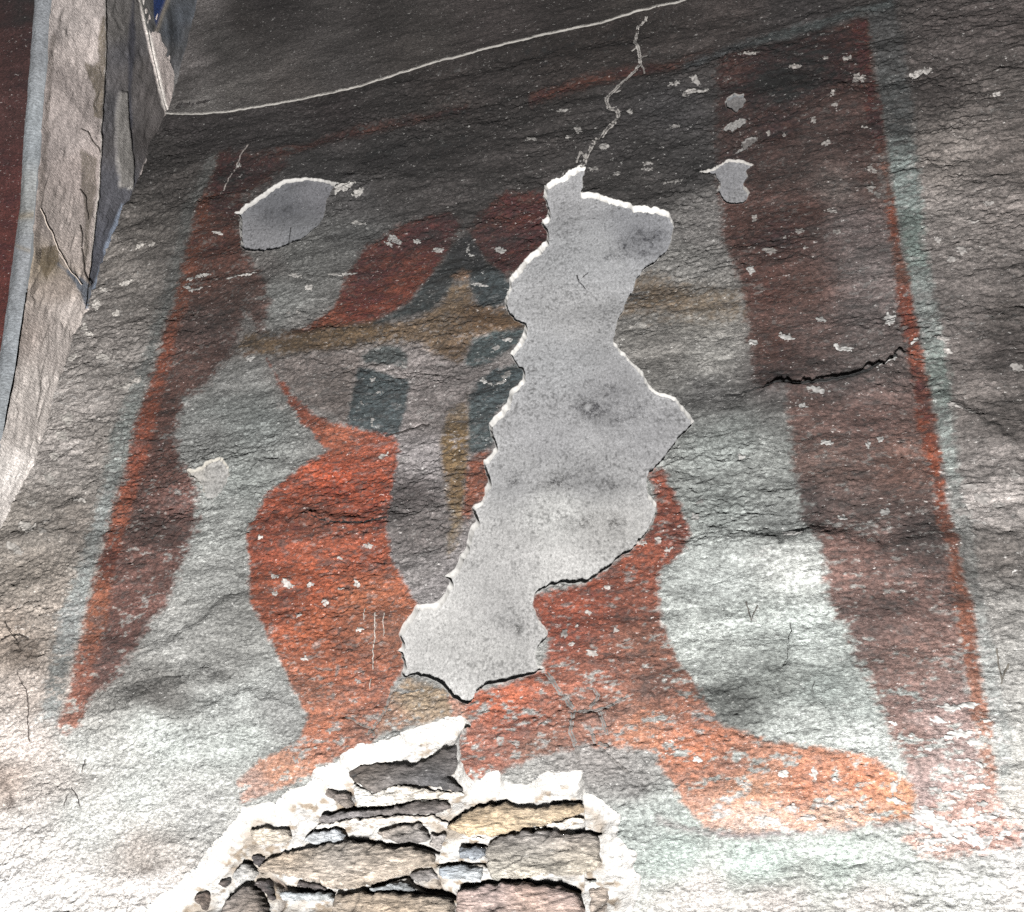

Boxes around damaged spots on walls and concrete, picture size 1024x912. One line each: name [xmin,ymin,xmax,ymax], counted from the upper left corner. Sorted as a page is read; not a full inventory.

crack [576,16,648,168]
peeling [667,74,710,98]
flaking render [699,93,786,205]
peeling [866,163,881,199]
peeling [883,312,896,326]
crack [725,354,898,396]
peeling [799,385,831,408]
flaking render [145,164,695,912]